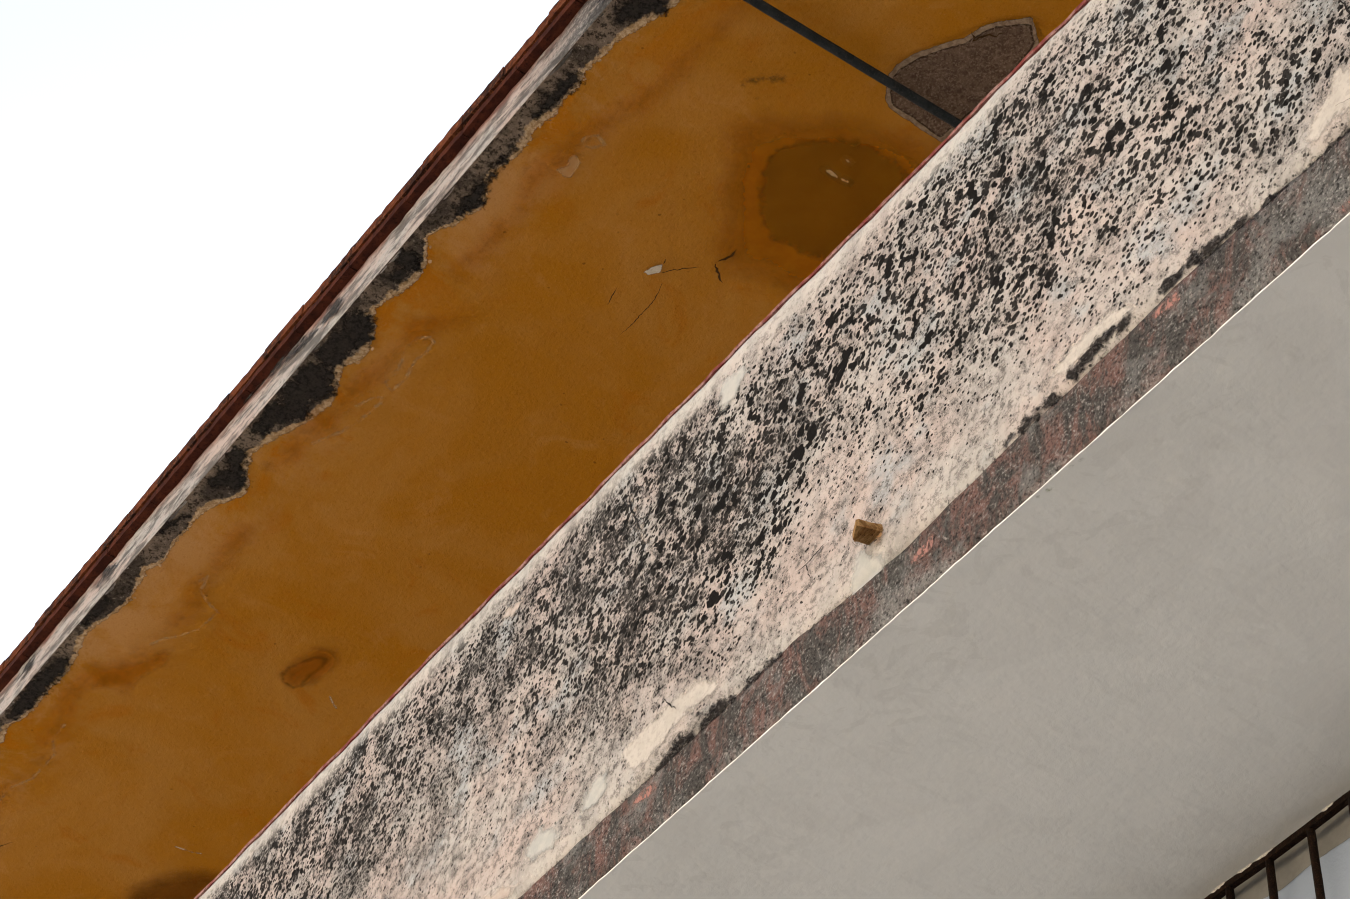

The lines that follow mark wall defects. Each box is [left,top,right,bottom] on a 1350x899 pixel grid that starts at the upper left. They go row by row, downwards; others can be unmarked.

flaking render [885,17,1039,142]
peeling [1305,67,1350,142]
water stain [728,126,921,286]
water stain [1158,125,1350,295]
water stain [245,297,377,436]
peeling [0,0,679,743]
peeling [720,366,748,408]
water stain [1002,311,1131,447]
water stain [206,445,249,490]
peeling [622,677,718,770]
water stain [654,652,782,775]
peeling [583,773,607,810]